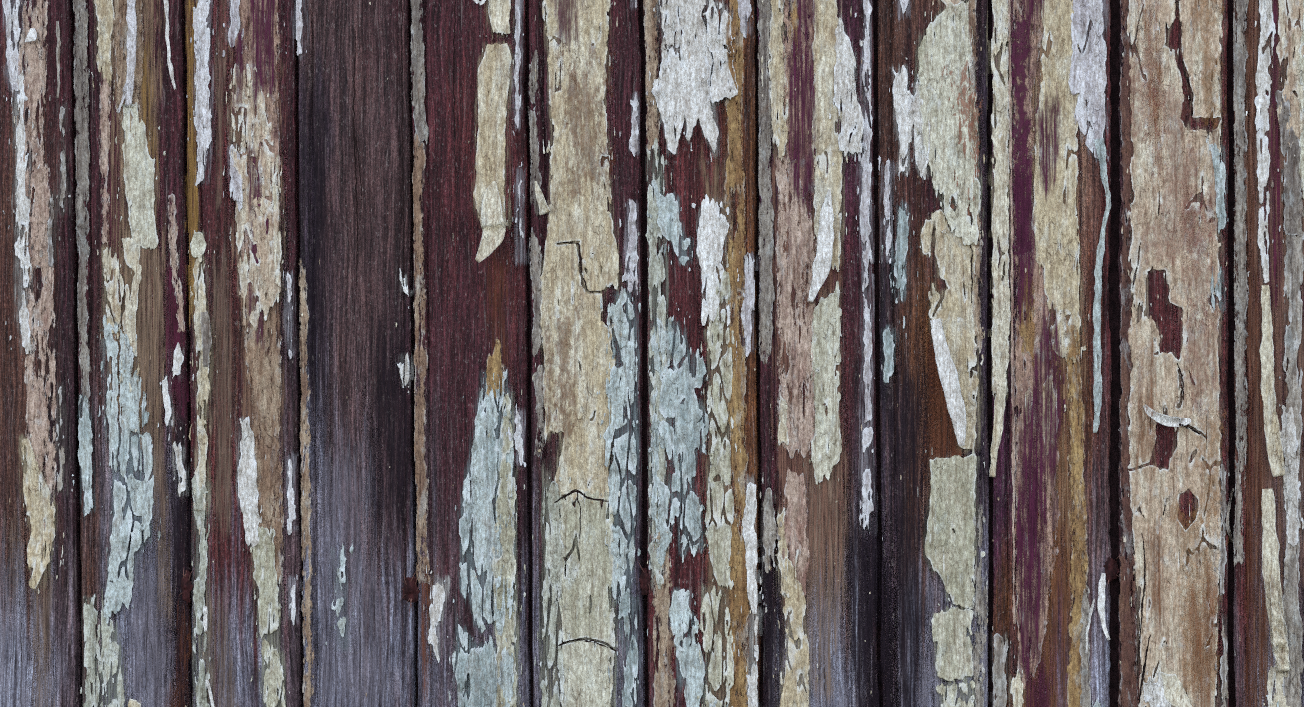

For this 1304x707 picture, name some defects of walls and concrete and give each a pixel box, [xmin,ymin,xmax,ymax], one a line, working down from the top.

peeling [2,0,218,707]
peeling [186,0,354,707]
crack [558,241,600,293]
crack [554,490,609,539]
crack [558,638,616,651]
peeling [397,0,1304,707]